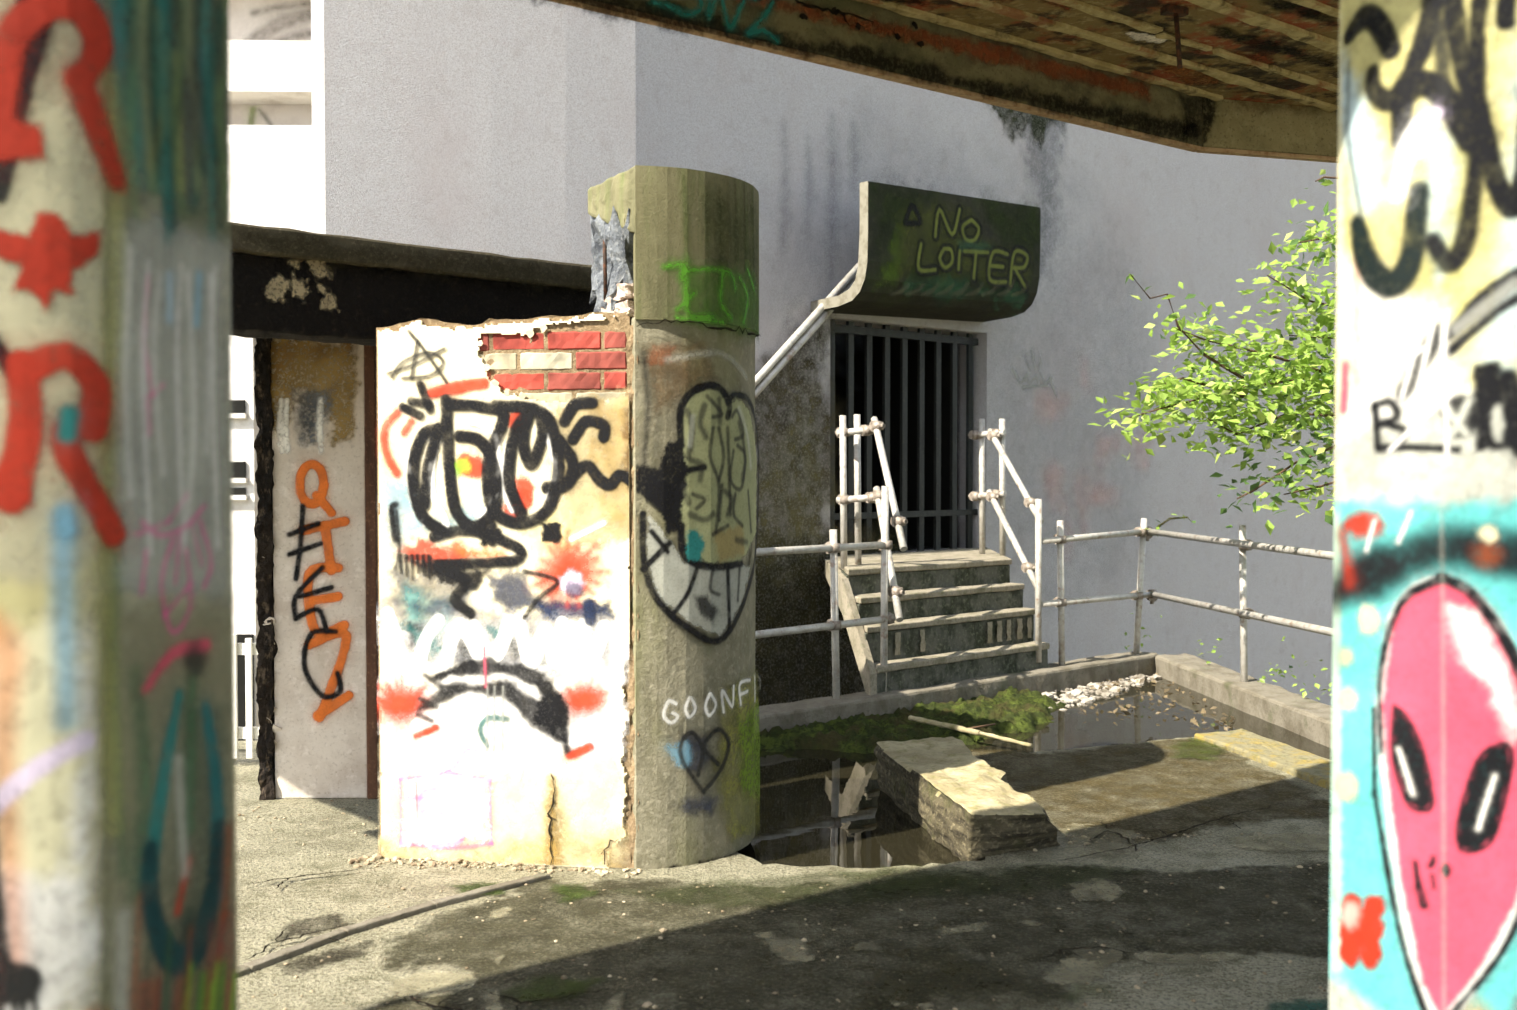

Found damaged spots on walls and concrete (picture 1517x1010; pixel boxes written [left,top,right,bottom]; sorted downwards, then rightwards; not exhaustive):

rust [1157,66,1220,85]
peeling [265,260,336,310]
spalling [477,205,634,402]
crack [547,773,557,865]
water stain [972,738,1331,848]
water stain [277,915,348,941]
water stain [285,943,364,972]
water stain [368,842,1330,1010]